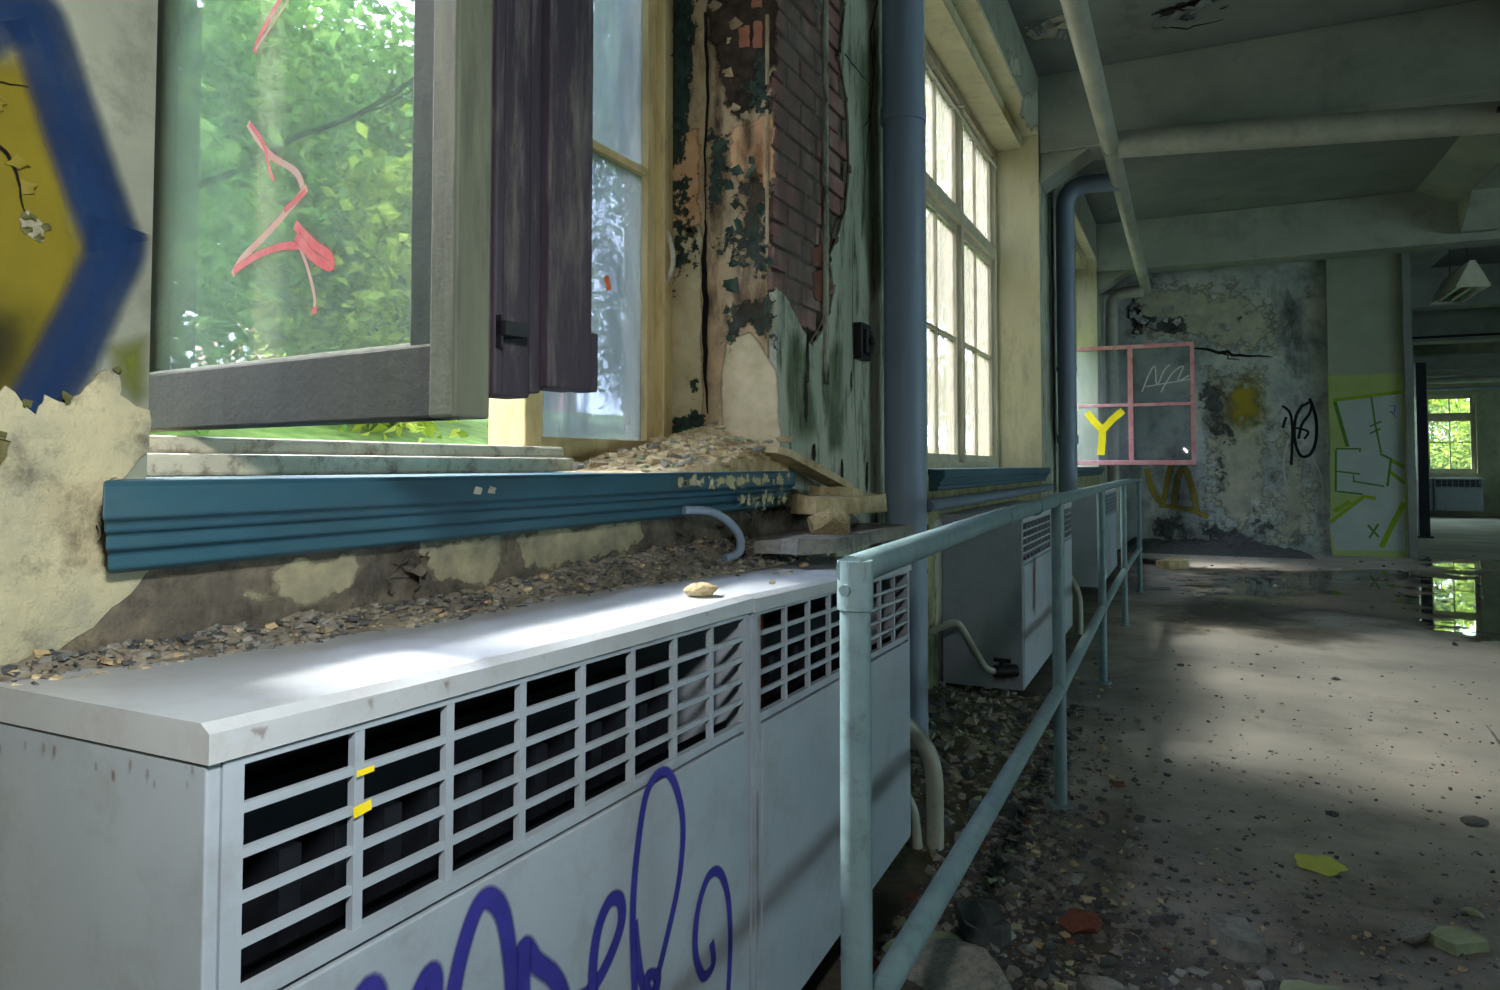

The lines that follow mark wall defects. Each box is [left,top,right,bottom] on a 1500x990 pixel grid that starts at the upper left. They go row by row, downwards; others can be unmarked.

spalling [1151,0,1229,30]
crack [0,145,26,213]
spalling [670,0,852,353]
spalling [0,366,811,666]